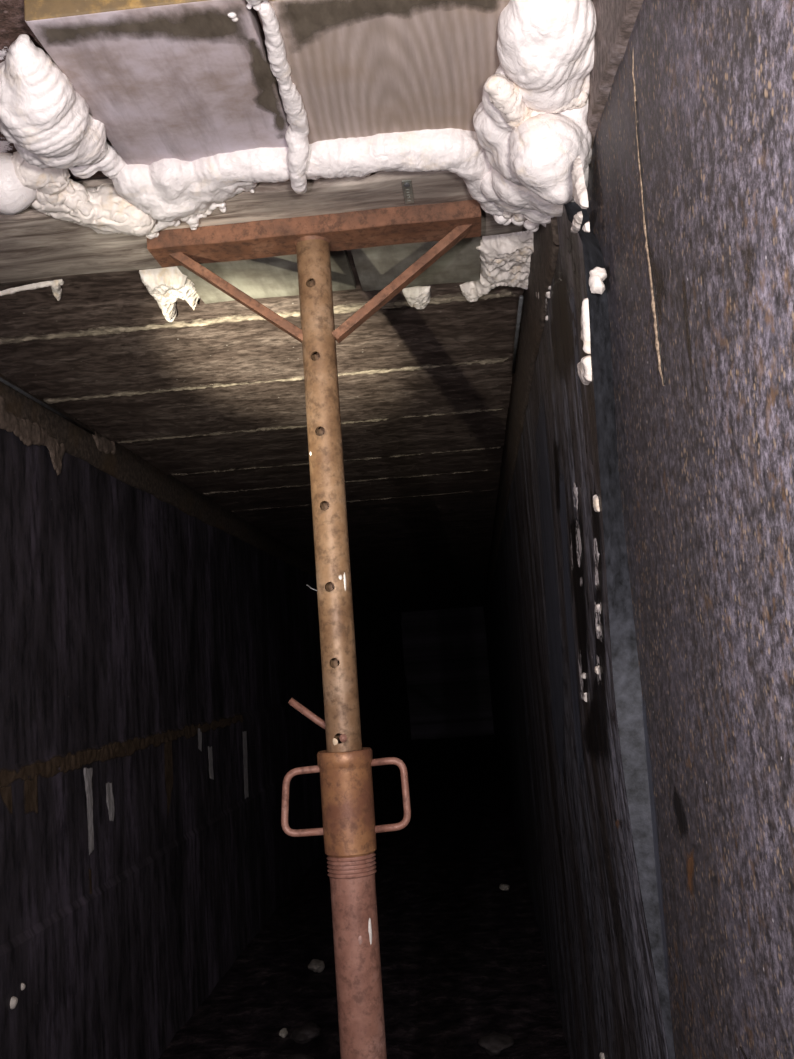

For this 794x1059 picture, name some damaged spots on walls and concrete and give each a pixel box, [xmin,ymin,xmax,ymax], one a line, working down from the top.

flaking render [0,395,66,475]